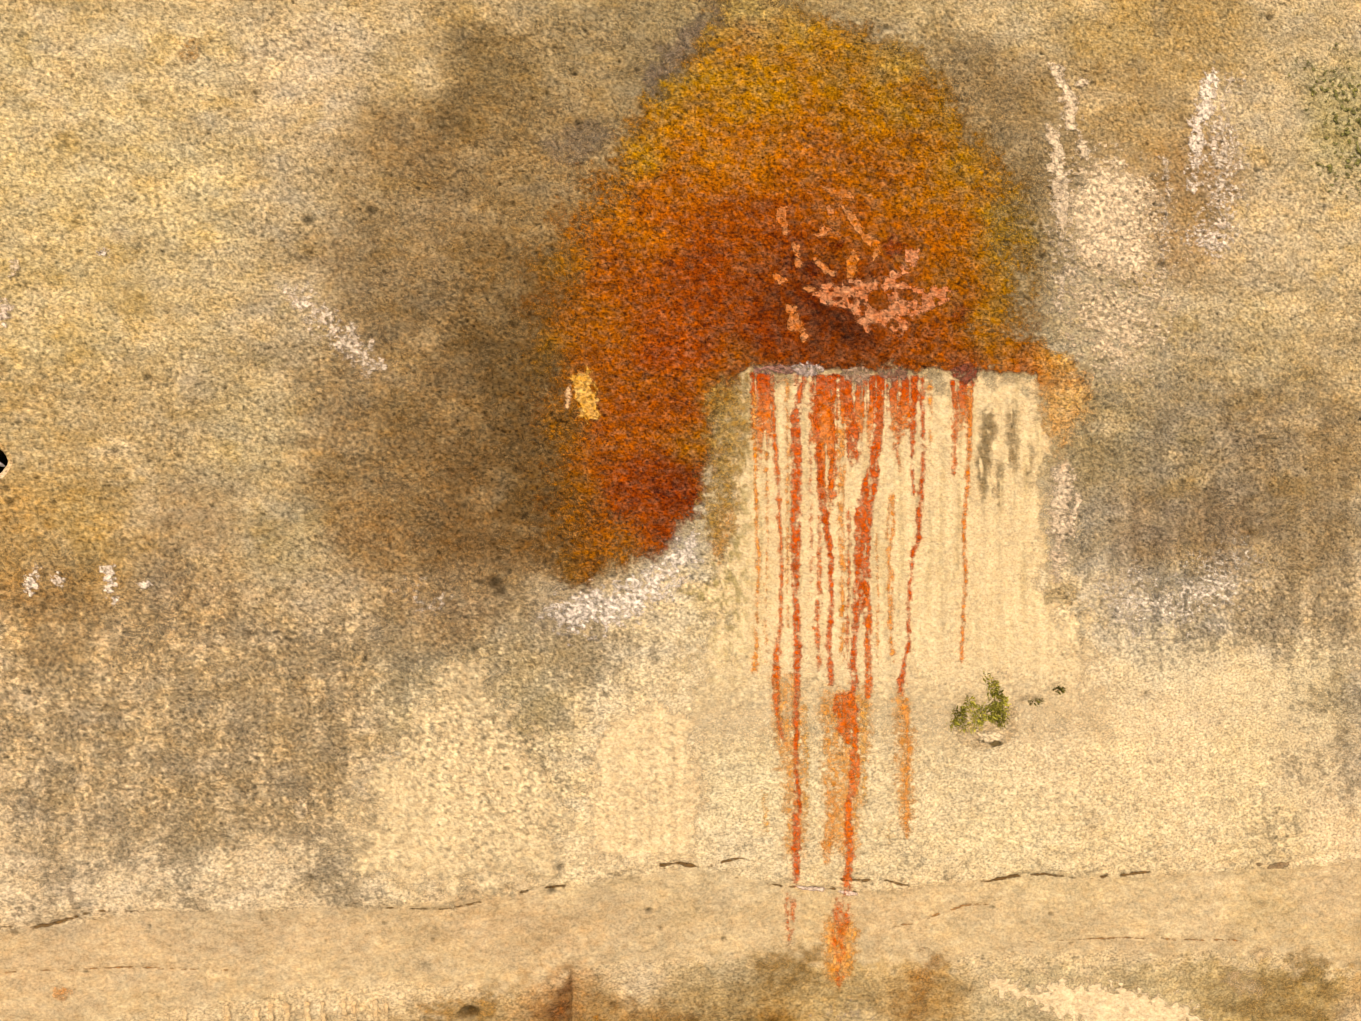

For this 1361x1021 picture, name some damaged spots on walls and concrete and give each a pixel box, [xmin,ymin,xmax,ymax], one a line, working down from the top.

leakage [0,298,14,328]
corrosion [522,0,1093,982]
leakage [283,0,1361,869]
leakage [0,535,575,903]
spalling [978,732,1004,743]